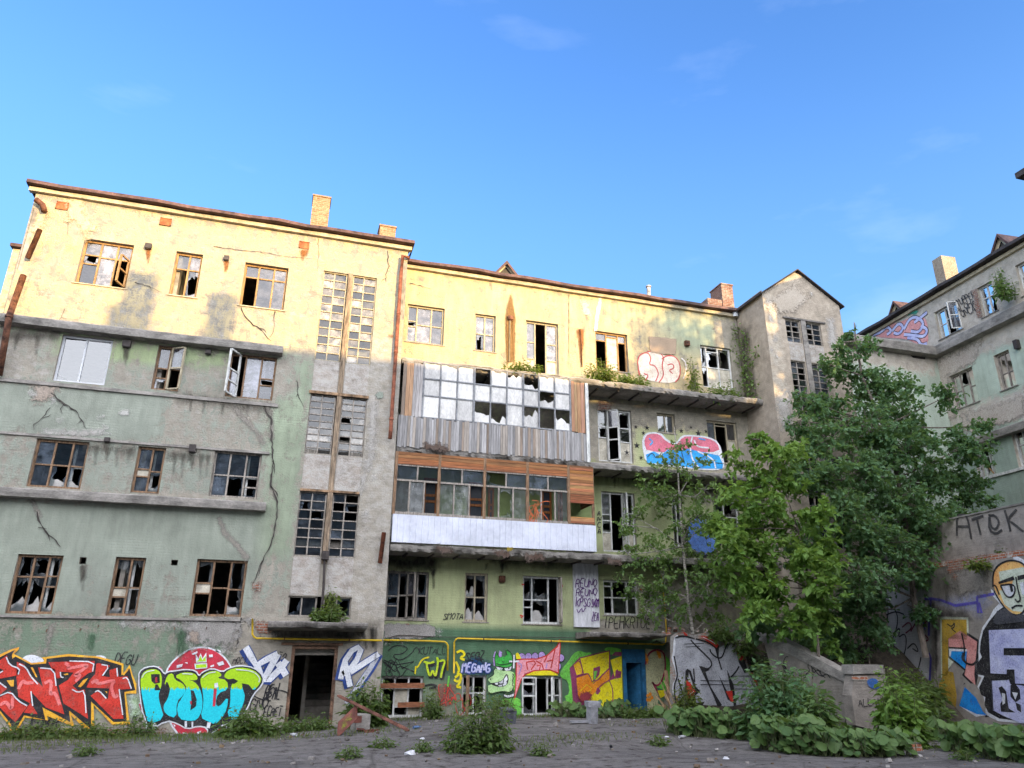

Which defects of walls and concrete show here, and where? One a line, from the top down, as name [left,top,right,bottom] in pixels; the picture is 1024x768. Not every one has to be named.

crack [241,307,276,340]
crack [33,393,85,427]
crack [217,403,278,583]
crack [29,499,61,547]